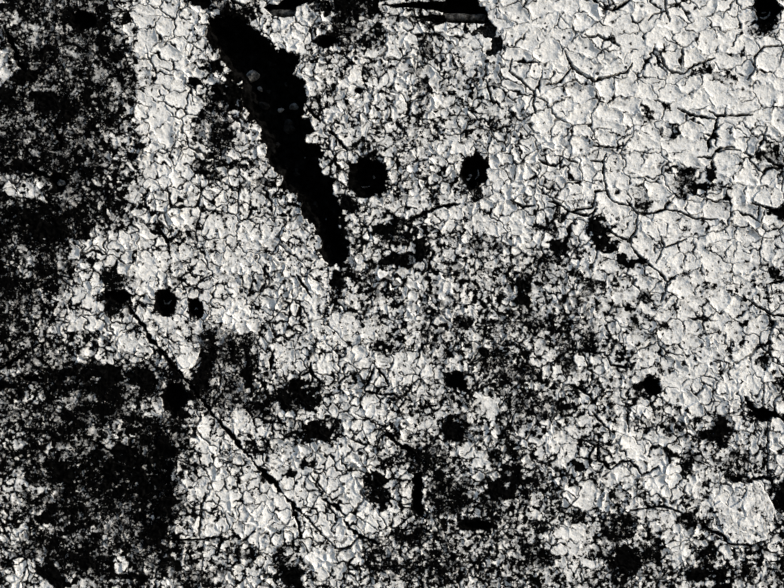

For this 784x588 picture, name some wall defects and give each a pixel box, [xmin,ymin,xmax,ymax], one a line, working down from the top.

spalling [386,0,502,56]
leakage [0,66,79,126]
spalling [206,18,349,266]
spalling [348,159,387,198]
spalling [460,155,487,189]
crack [680,110,747,169]
crack [516,145,715,301]
leakage [46,362,165,391]
crack [129,306,377,549]
crack [568,384,657,474]
leakage [45,433,183,554]
leakage [34,555,78,588]